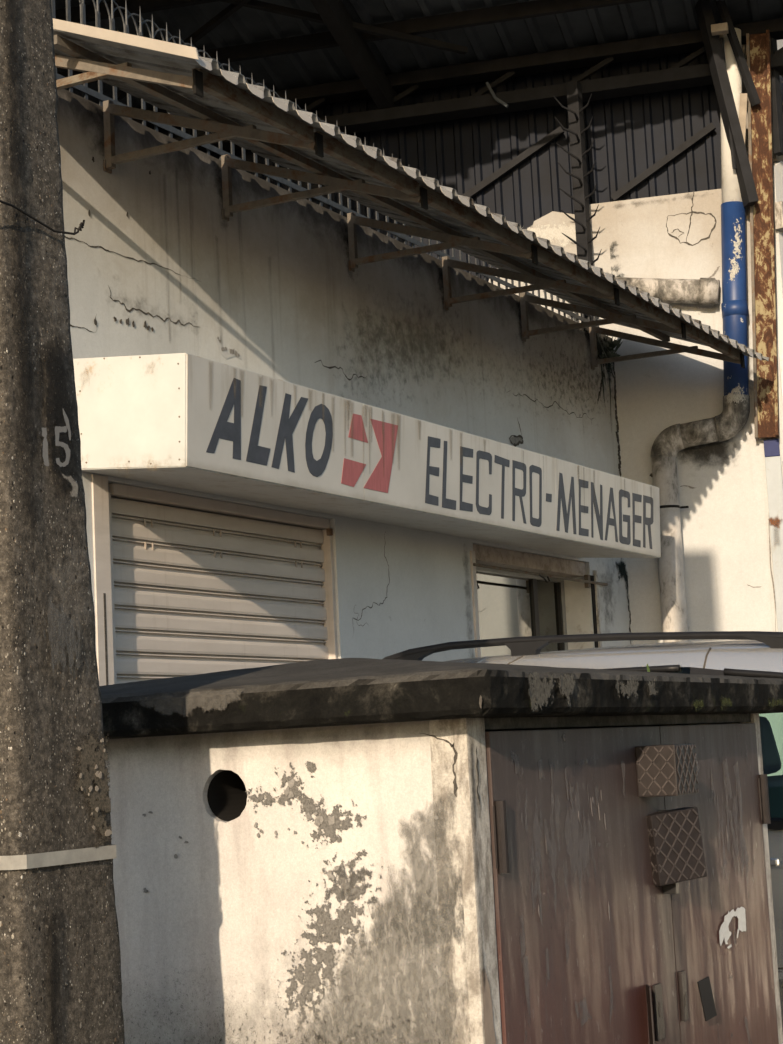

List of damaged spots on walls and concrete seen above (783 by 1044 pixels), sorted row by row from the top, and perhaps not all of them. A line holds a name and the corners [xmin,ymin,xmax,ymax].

crack [666,191,716,246]
crack [65,236,201,282]
crack [70,288,198,332]
leakage [584,328,615,413]
crack [352,534,390,629]
leakage [616,561,628,588]
spalling [73,726,112,849]